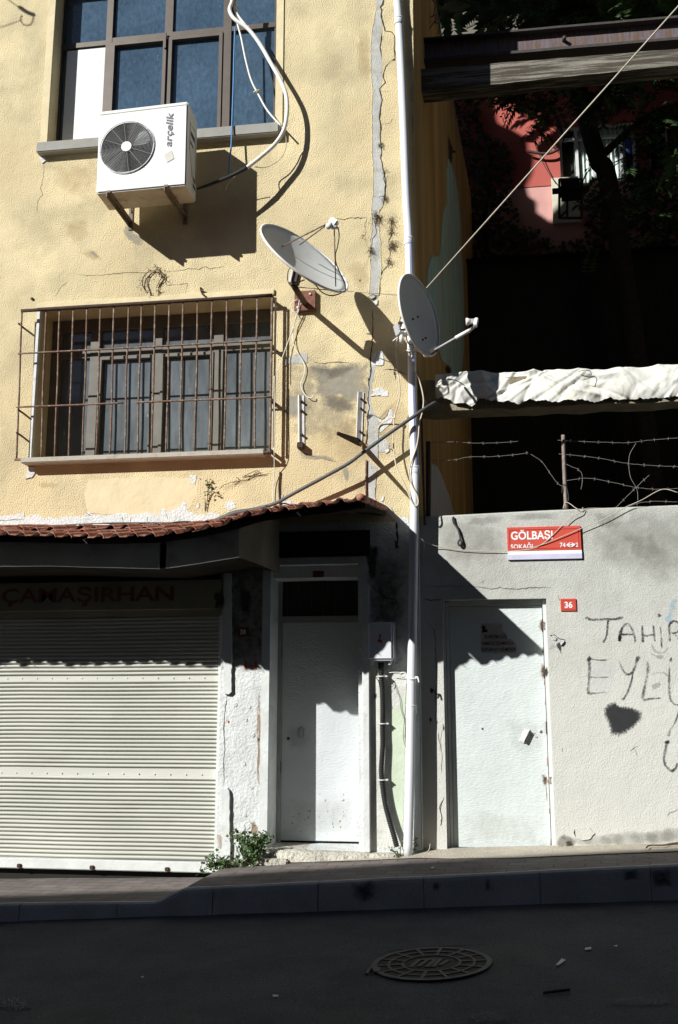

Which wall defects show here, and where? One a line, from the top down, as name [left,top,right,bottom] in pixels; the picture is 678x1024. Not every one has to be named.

crack [342,0,405,382]
peeling [0,501,236,530]
water stain [285,361,365,415]
flaking render [365,363,410,541]